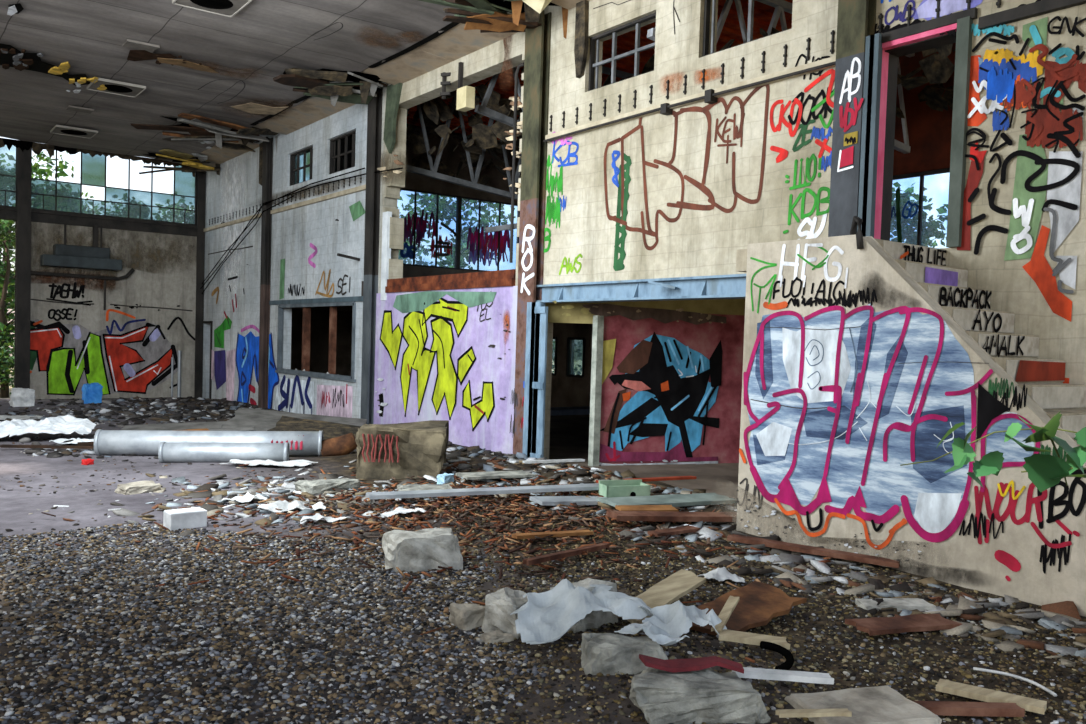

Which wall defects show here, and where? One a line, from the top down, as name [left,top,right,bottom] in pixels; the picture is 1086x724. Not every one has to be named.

peeling [522,0,552,14]
peeling [48,62,107,93]
peeling [231,100,288,117]